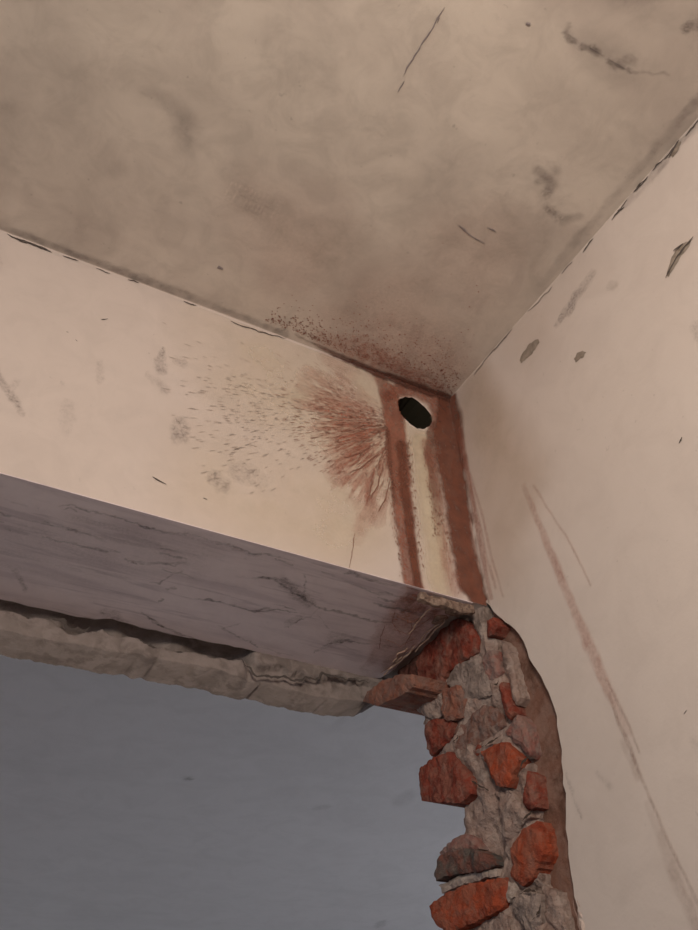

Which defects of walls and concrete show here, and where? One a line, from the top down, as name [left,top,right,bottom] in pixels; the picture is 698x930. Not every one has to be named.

rust [275,348,487,676]
flaking render [0,592,585,930]